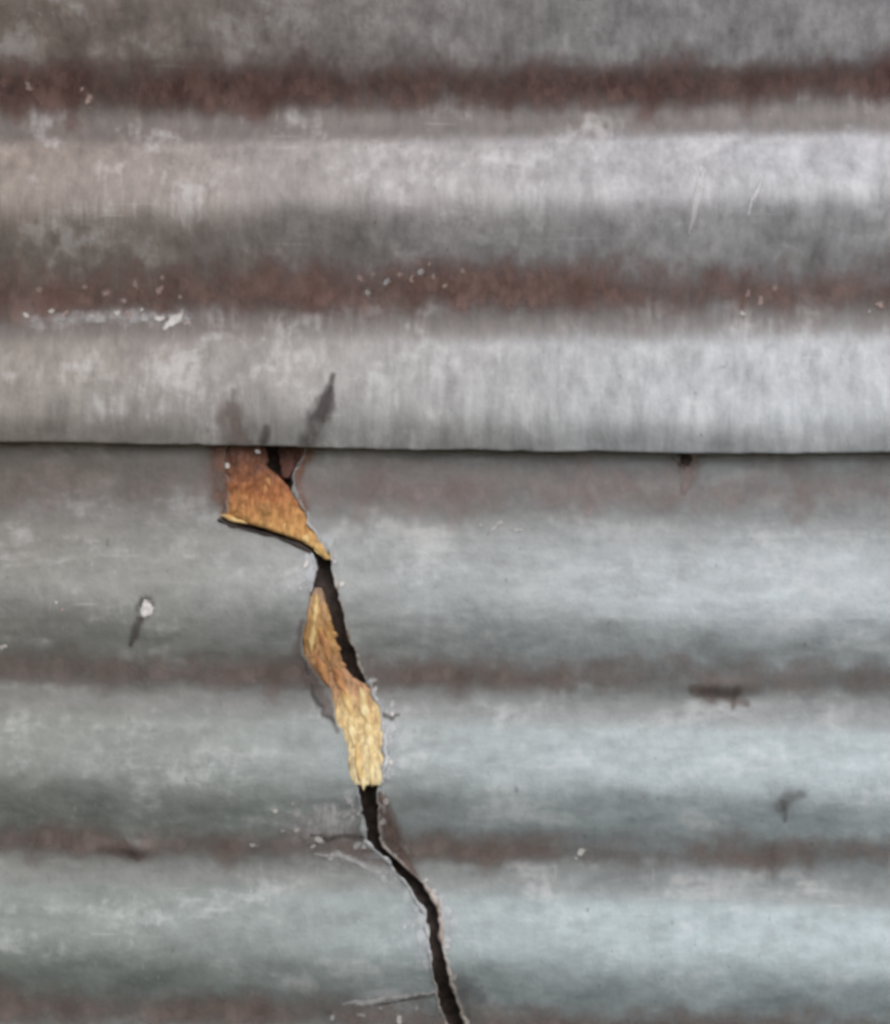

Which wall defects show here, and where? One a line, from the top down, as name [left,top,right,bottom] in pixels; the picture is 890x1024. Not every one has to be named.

rust [0,56,890,117]
rust [0,260,653,316]
water stain [304,373,335,446]
spalling [212,445,330,560]
spalling [280,579,384,860]
crack [289,537,470,1024]